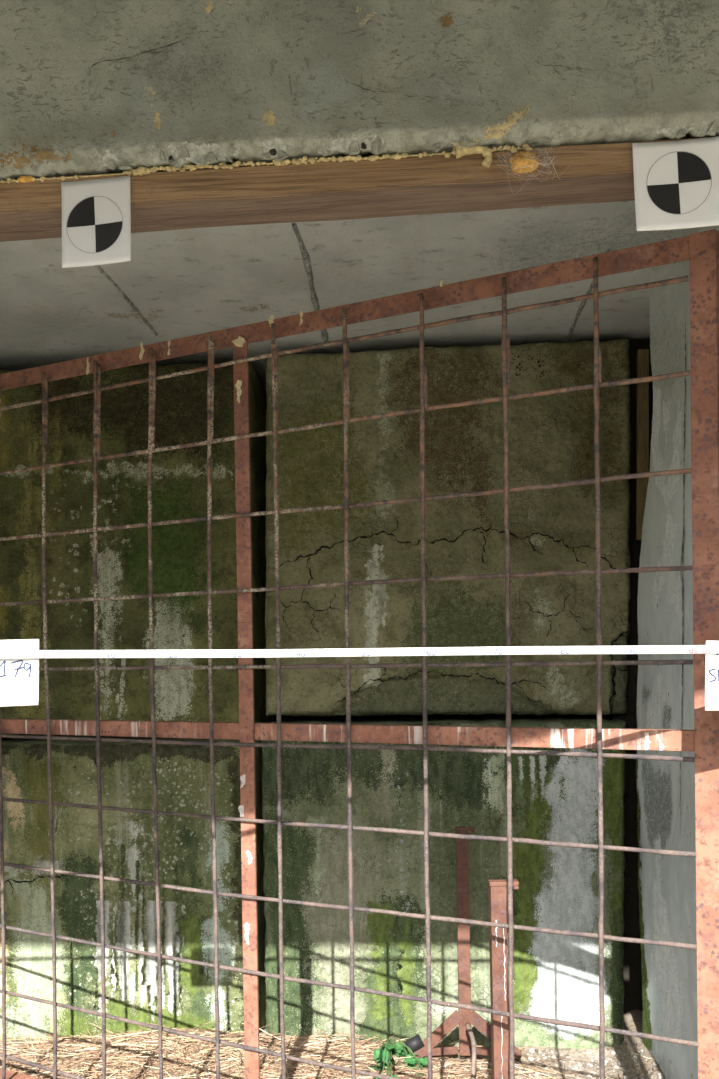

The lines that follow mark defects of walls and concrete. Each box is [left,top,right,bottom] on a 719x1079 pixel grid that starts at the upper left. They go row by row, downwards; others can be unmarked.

rust [0,137,71,170]
damp [5,363,235,496]
damp [372,345,516,537]
damp [547,339,630,501]
damp [92,550,127,720]
efflorescence [362,544,391,688]
crack [333,668,551,706]
crack [268,520,621,636]
efflorescence [540,667,583,712]
crack [523,591,630,711]
damp [0,743,244,1040]
damp [261,740,593,1041]